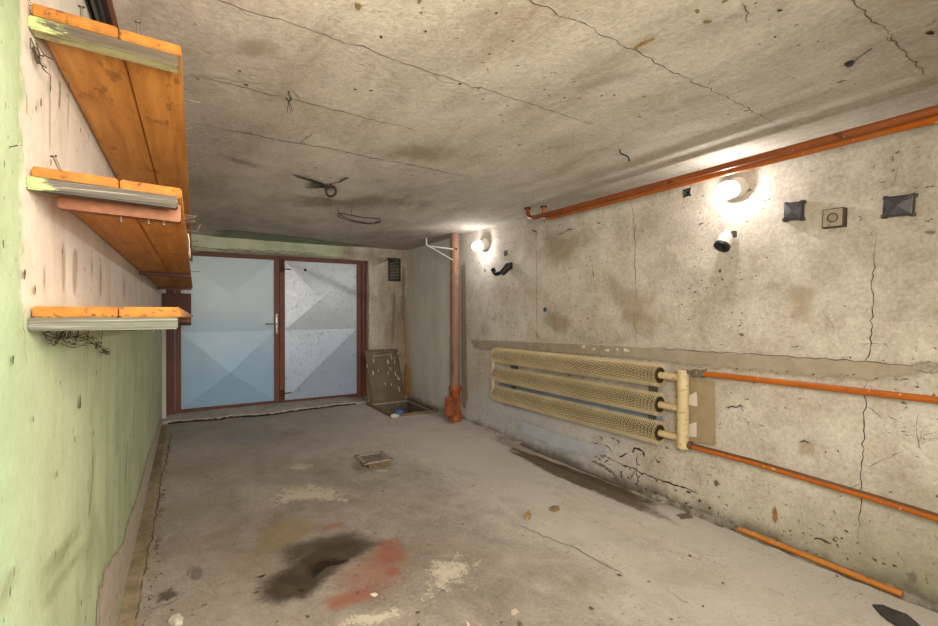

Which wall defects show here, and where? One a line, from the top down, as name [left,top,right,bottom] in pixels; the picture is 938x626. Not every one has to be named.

crack [219,0,615,132]
crack [529,0,778,125]
crack [851,0,924,75]
crack [853,235,938,538]
peeling [85,419,162,626]